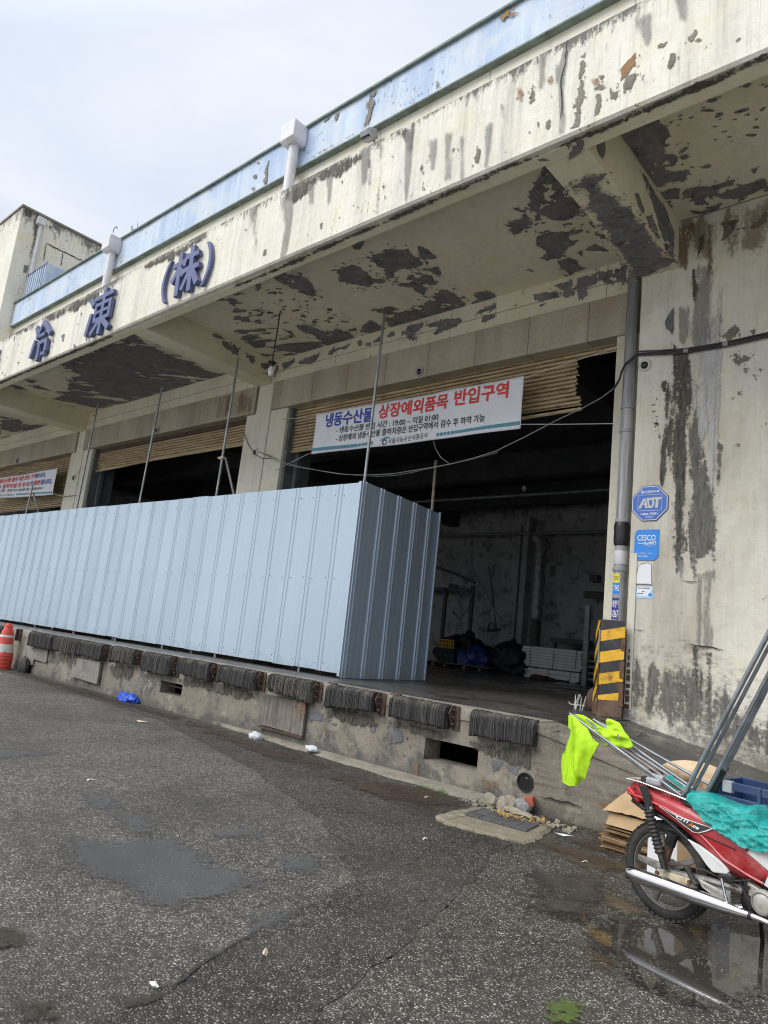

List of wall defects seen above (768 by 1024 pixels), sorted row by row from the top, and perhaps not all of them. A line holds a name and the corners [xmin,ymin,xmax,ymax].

damp [635,13,651,44]
crack [559,44,567,118]
peeling [570,52,640,129]
damp [537,47,768,147]
damp [234,122,545,287]
peeling [504,96,768,307]
damp [723,199,768,254]
peeling [212,241,496,377]
peeling [2,334,224,416]
damp [658,216,723,697]